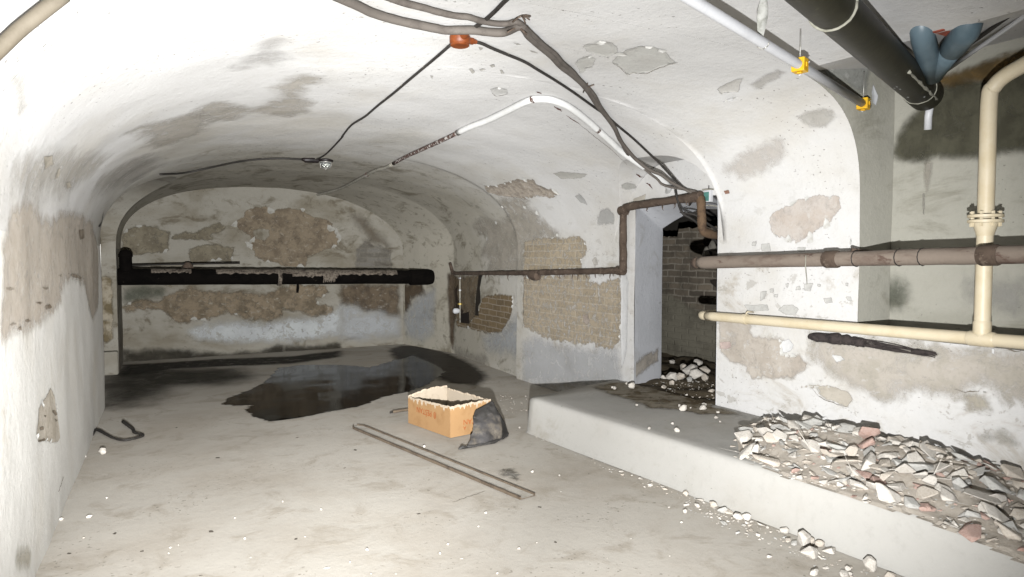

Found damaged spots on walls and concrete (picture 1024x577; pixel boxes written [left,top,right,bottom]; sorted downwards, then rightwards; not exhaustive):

peeling [576,41,678,75]
water stain [894,77,991,185]
water stain [997,74,1024,153]
peeling [752,195,841,251]
peeling [2,205,341,343]
flaking render [455,172,658,376]
peeling [745,283,832,315]
peeling [719,322,1024,407]
flaking render [36,388,60,444]